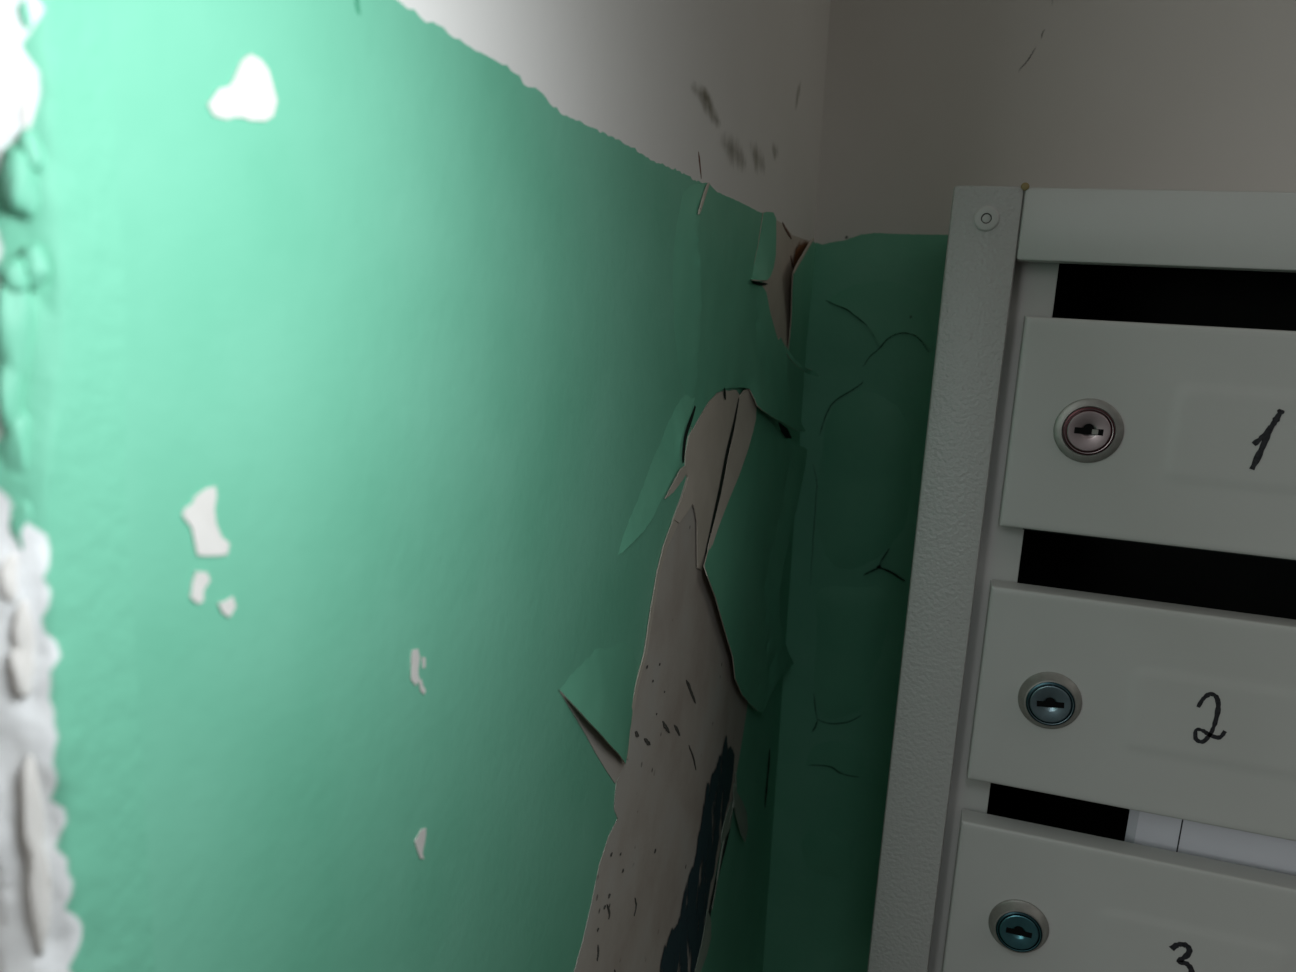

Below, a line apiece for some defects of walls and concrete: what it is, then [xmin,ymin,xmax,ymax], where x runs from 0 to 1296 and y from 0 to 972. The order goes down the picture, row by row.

spalling [16,0,32,30]
peeling [207,54,277,121]
spalling [1,88,47,219]
spalling [0,244,51,477]
spalling [0,501,34,698]
peeling [182,486,236,617]
peeling [574,183,819,972]
crack [864,549,905,581]
peeling [410,649,426,694]
spalling [23,755,50,956]